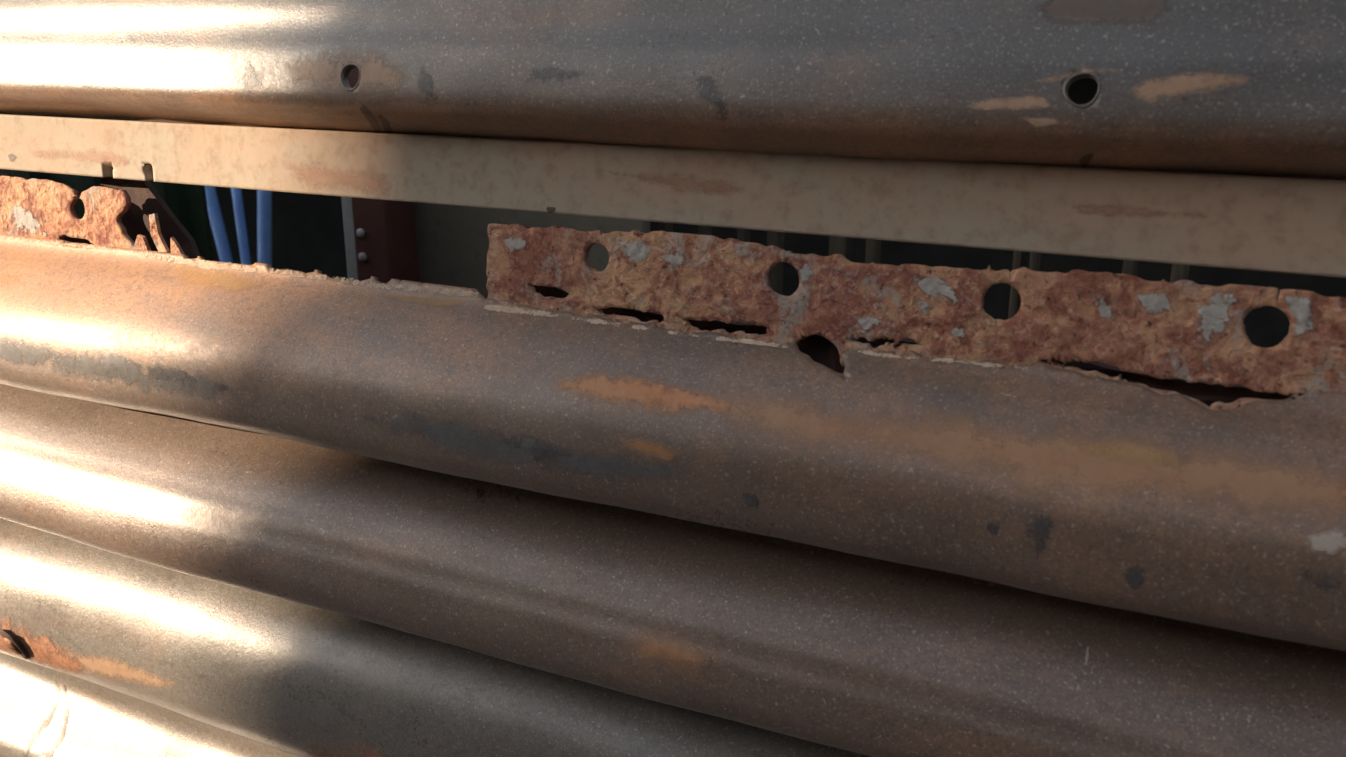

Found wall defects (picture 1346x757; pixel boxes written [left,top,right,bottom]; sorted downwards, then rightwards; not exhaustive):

corrosion [293,51,400,89]
corrosion [715,336,788,348]
corrosion [857,349,1028,370]
corrosion [560,375,733,413]
crack [1041,359,1292,407]
corrosion [0,619,164,686]